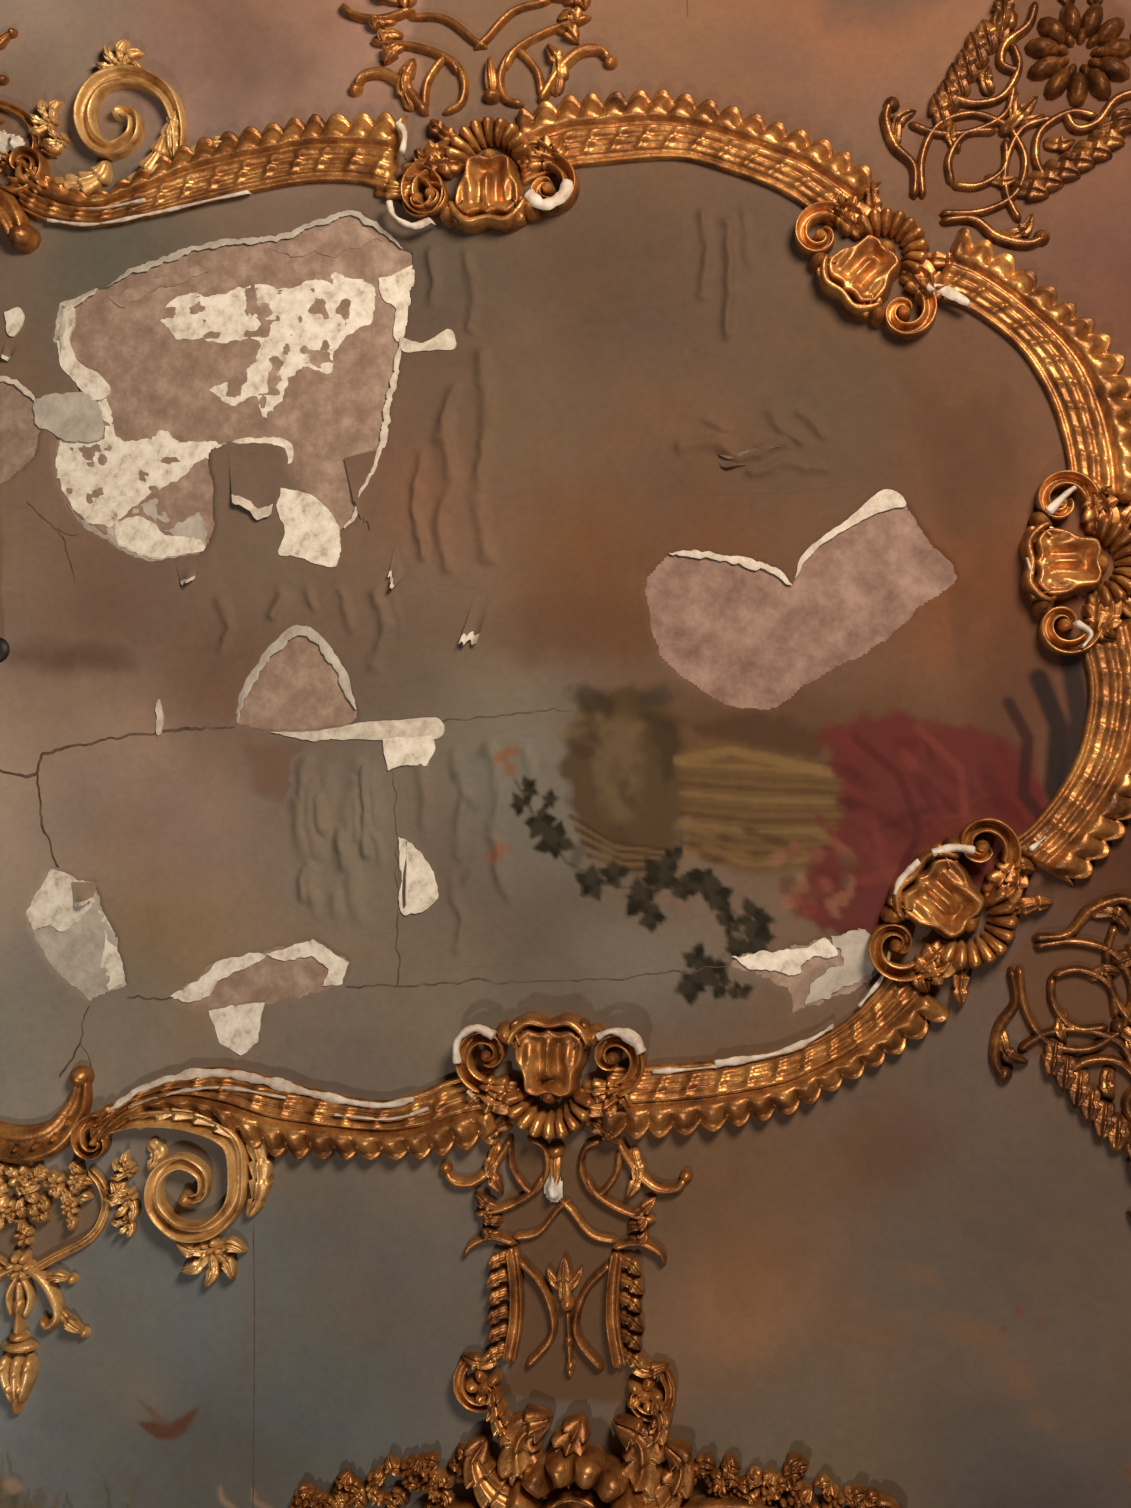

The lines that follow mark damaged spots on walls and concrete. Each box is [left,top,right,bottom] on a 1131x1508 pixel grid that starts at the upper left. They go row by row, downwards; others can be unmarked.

flaking render [0,210,457,567]
flaking render [645,489,957,710]
crack [0,726,235,867]
peeling [383,735,436,771]
crack [442,708,574,722]
crack [59,1006,91,1078]
flaking render [26,869,126,1001]
crack [127,993,174,1001]
flaking render [170,939,349,1055]
flaking render [398,836,439,915]
crack [345,770,728,989]
flaking render [731,928,874,1013]